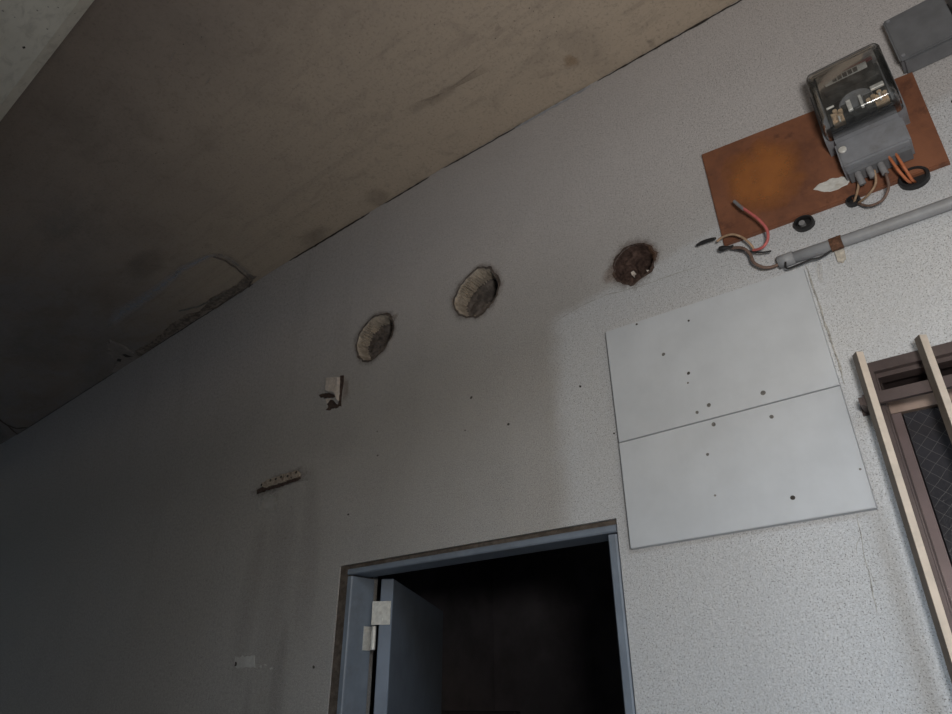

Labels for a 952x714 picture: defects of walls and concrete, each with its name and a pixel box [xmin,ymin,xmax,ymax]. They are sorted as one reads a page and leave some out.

spalling [136,254,257,358]